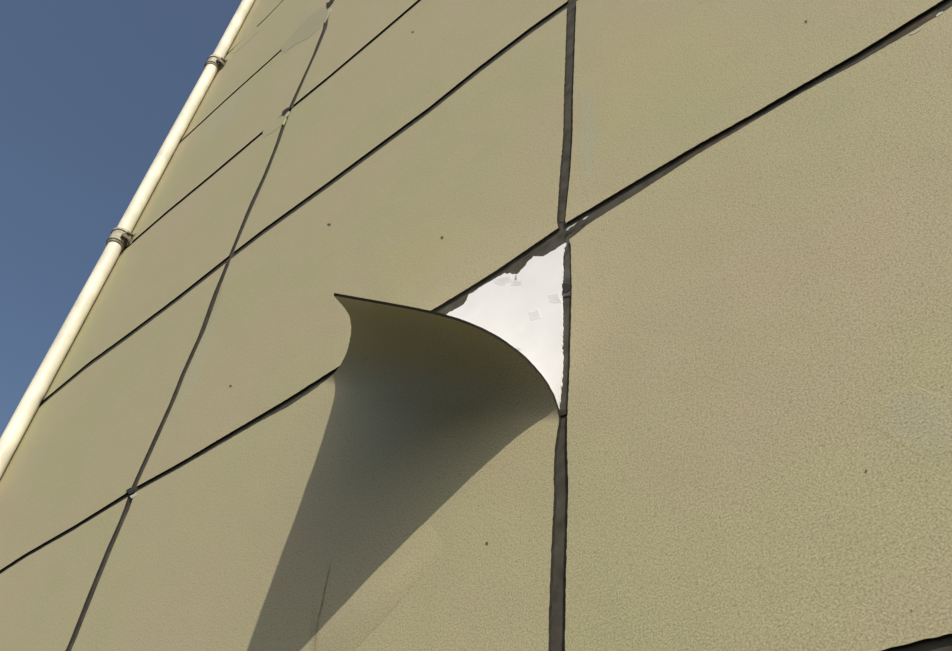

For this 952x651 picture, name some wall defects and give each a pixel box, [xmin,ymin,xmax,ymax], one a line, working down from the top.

peeling [321,293,561,426]
crack [314,567,330,651]